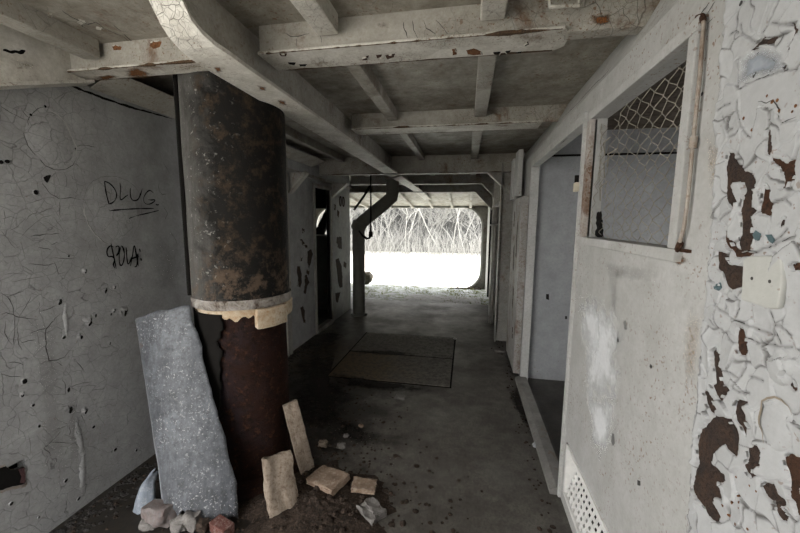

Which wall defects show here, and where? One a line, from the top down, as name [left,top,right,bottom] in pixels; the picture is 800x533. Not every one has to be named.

crack [71,86,172,119]
rust [67,60,201,81]
rust [286,50,552,71]
peeling [752,37,778,50]
peeling [764,128,796,189]
peeling [713,153,775,291]
crack [1,106,92,456]
peeling [297,228,313,294]
peeling [335,237,347,303]
peeling [734,326,748,355]
leakage [582,307,616,443]
peeling [693,347,800,521]